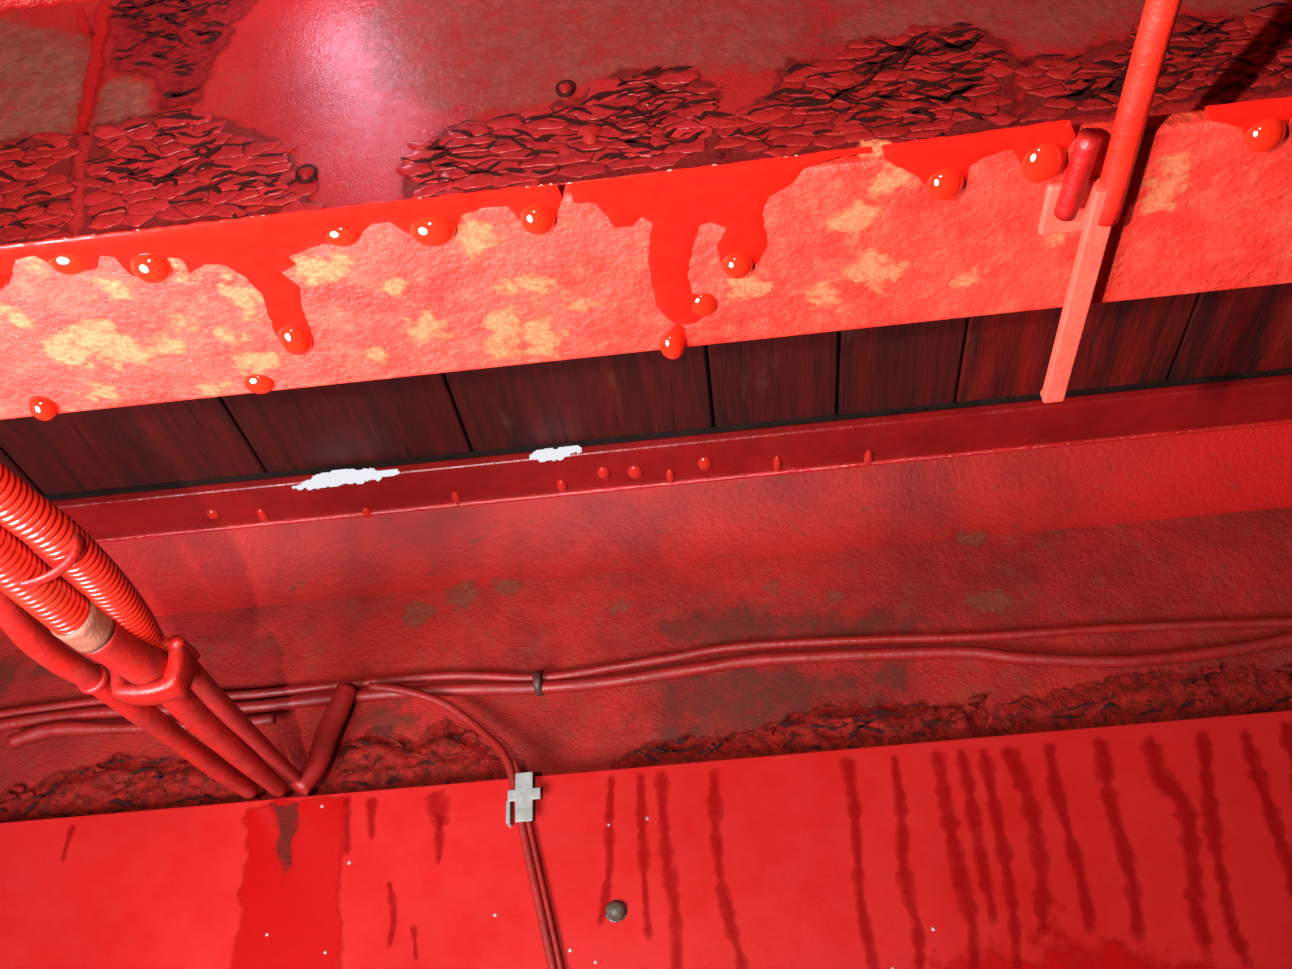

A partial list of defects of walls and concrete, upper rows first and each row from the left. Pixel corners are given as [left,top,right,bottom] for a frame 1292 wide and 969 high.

peeling [0,0,326,277]
peeling [382,278,407,296]
leakage [0,121,1075,346]
peeling [484,274,605,360]
peeling [396,20,1141,312]
peeling [1140,152,1195,214]
peeling [1151,2,1292,112]
leakage [1205,96,1292,138]
leakage [231,797,350,969]
leakage [637,775,680,969]
leakage [934,741,1150,969]
leakage [1147,735,1244,959]